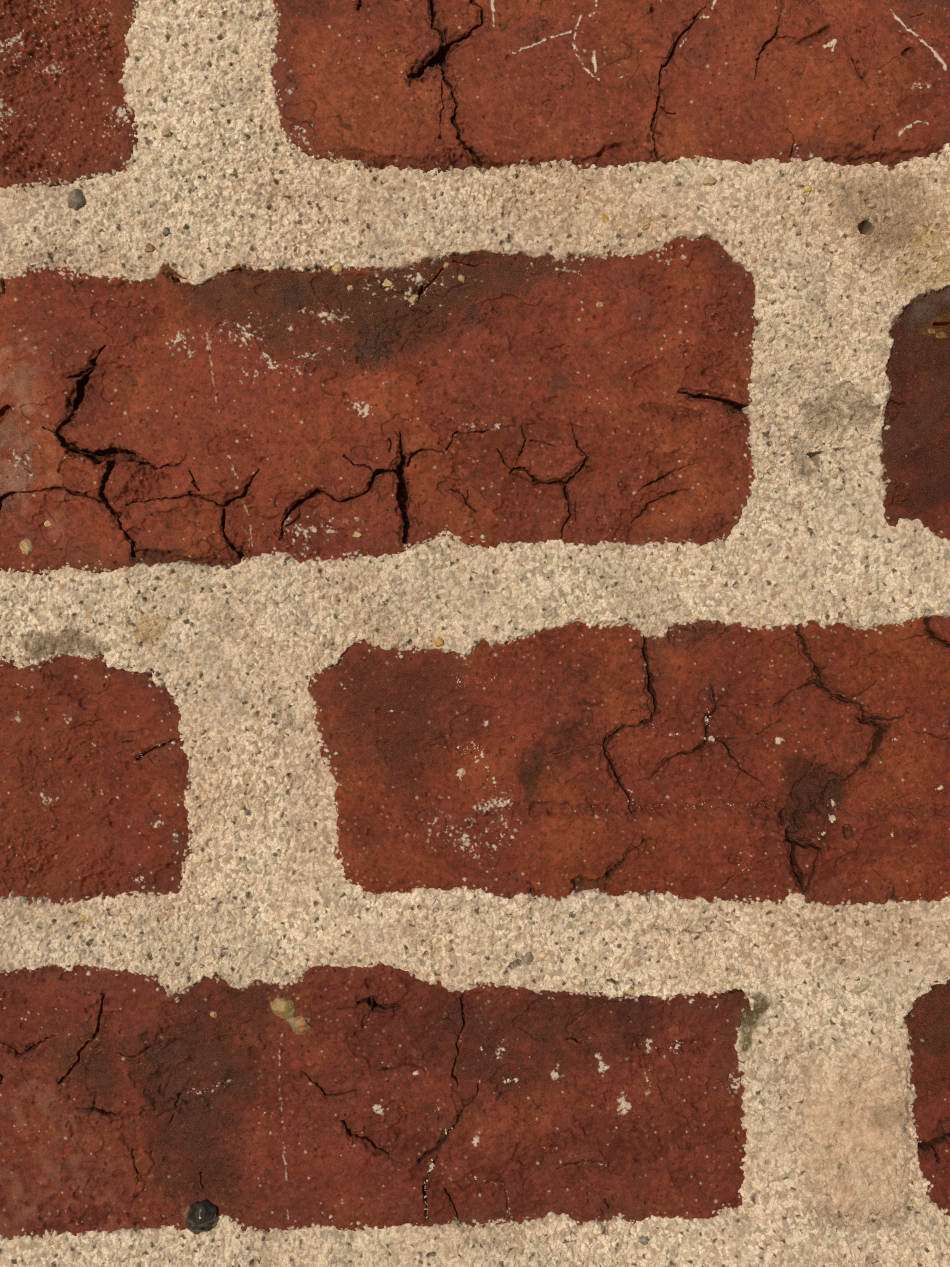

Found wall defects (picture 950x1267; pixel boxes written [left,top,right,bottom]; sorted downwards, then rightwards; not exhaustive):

crack [354,0,364,12]
crack [405,0,486,169]
crack [649,4,710,162]
crack [751,0,799,82]
crack [849,54,872,91]
crack [785,126,798,159]
crack [675,389,751,417]
crack [0,341,263,564]
crack [277,417,591,547]
crack [629,460,703,526]
crack [897,614,950,651]
crack [549,624,950,940]